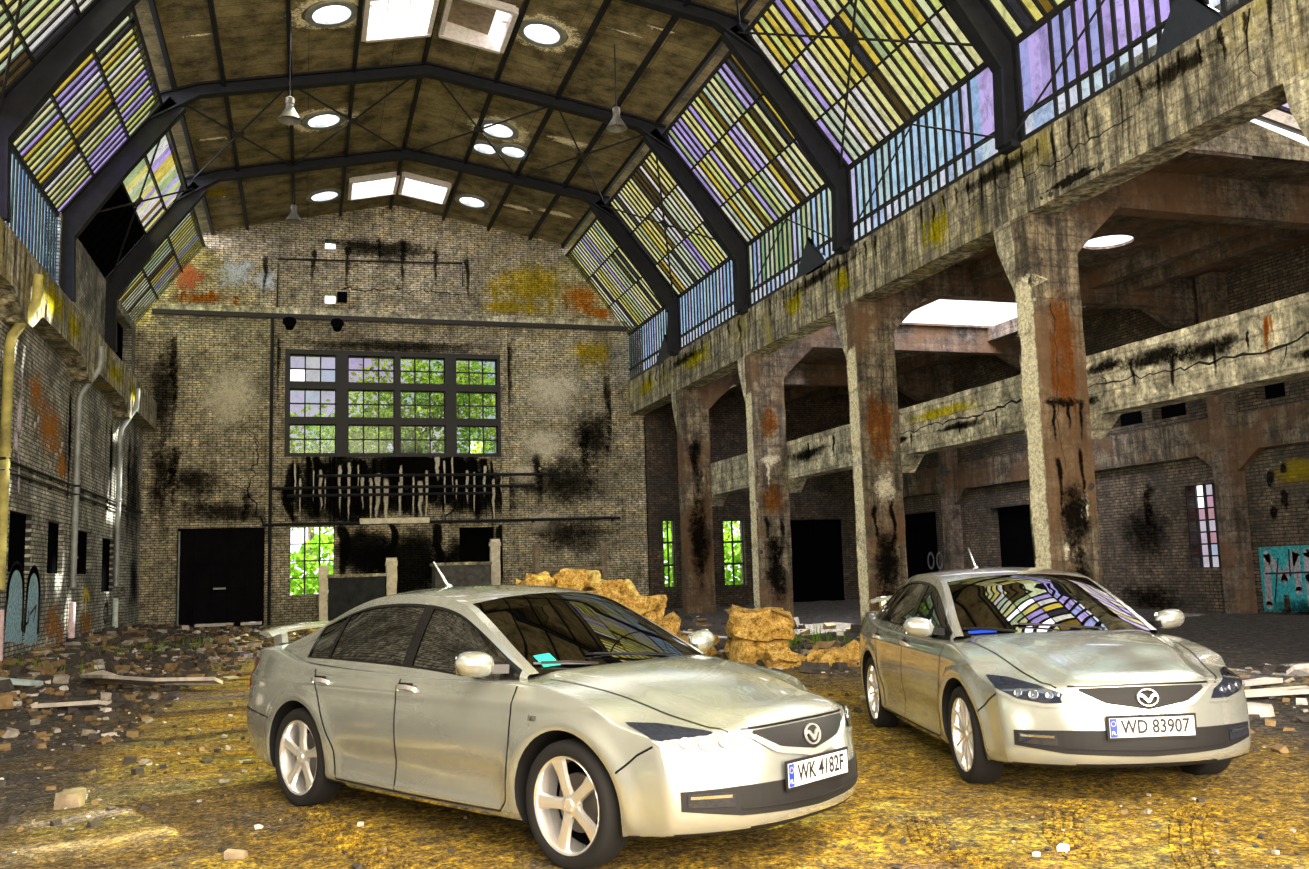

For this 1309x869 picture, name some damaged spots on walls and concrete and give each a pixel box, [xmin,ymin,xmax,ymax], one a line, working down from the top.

leakage [1136,24,1227,105]
leakage [920,108,1090,237]
leakage [310,238,442,294]
crack [878,365,1021,449]
crack [1050,303,1309,465]
leakage [1143,484,1154,524]